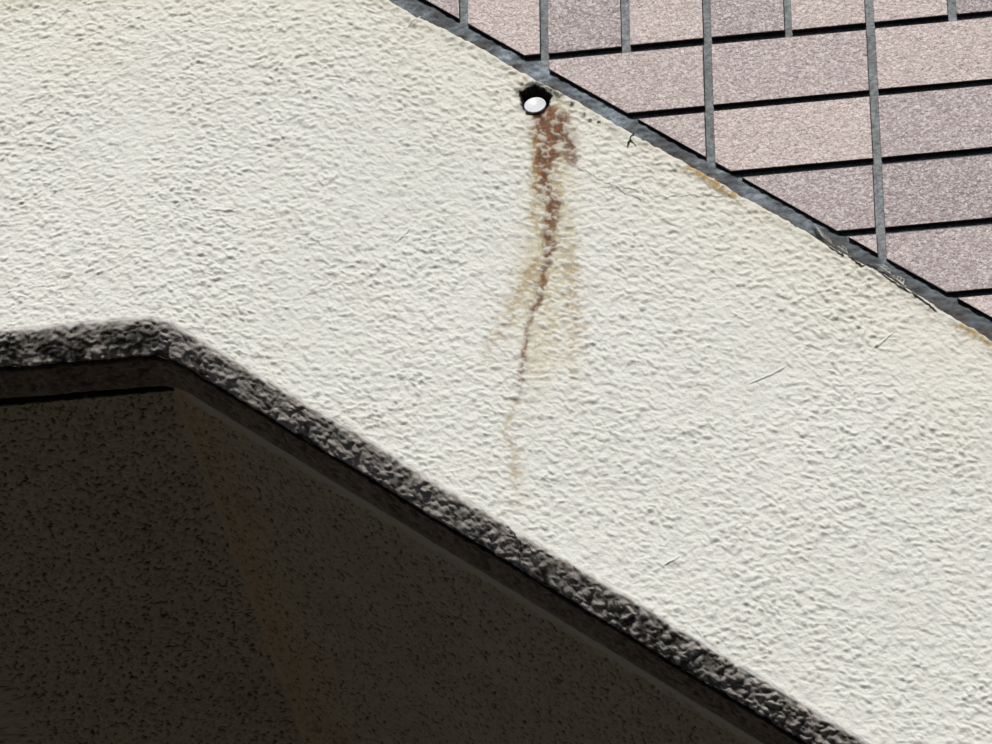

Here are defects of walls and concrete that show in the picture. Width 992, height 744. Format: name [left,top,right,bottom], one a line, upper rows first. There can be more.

rust [529,107,575,322]
crack [569,163,731,202]
crack [506,525,538,560]
crack [565,566,697,674]